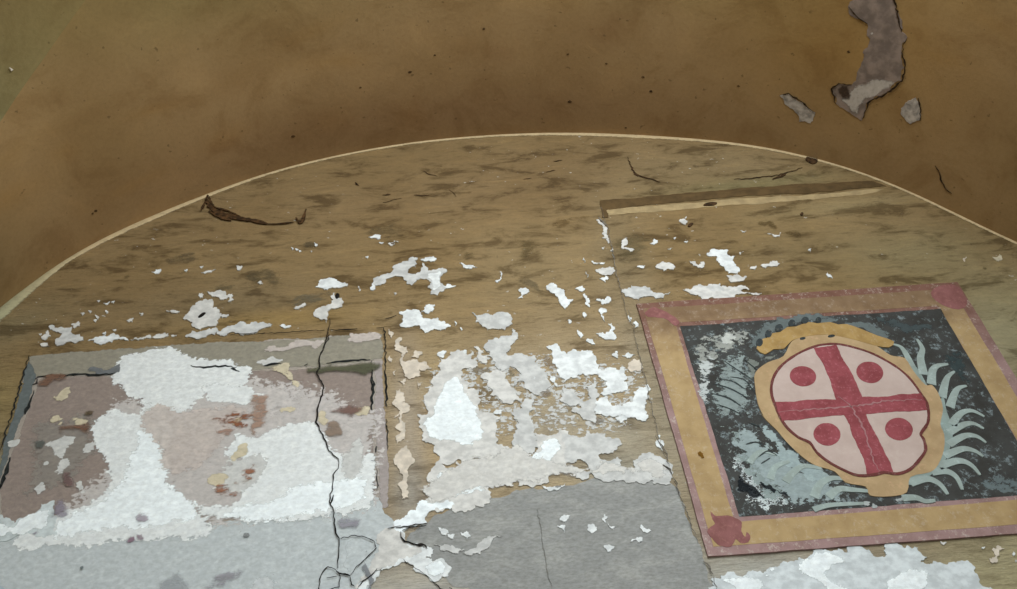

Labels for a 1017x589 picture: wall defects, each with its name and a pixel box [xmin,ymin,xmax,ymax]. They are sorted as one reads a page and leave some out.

spalling [831,0,907,121]
spalling [779,93,816,123]
spalling [901,98,921,124]
peeling [582,219,634,282]
peeling [683,249,780,299]
peeling [0,256,675,589]
crack [231,315,452,589]
peeling [708,543,992,589]
peeling [981,545,1017,564]